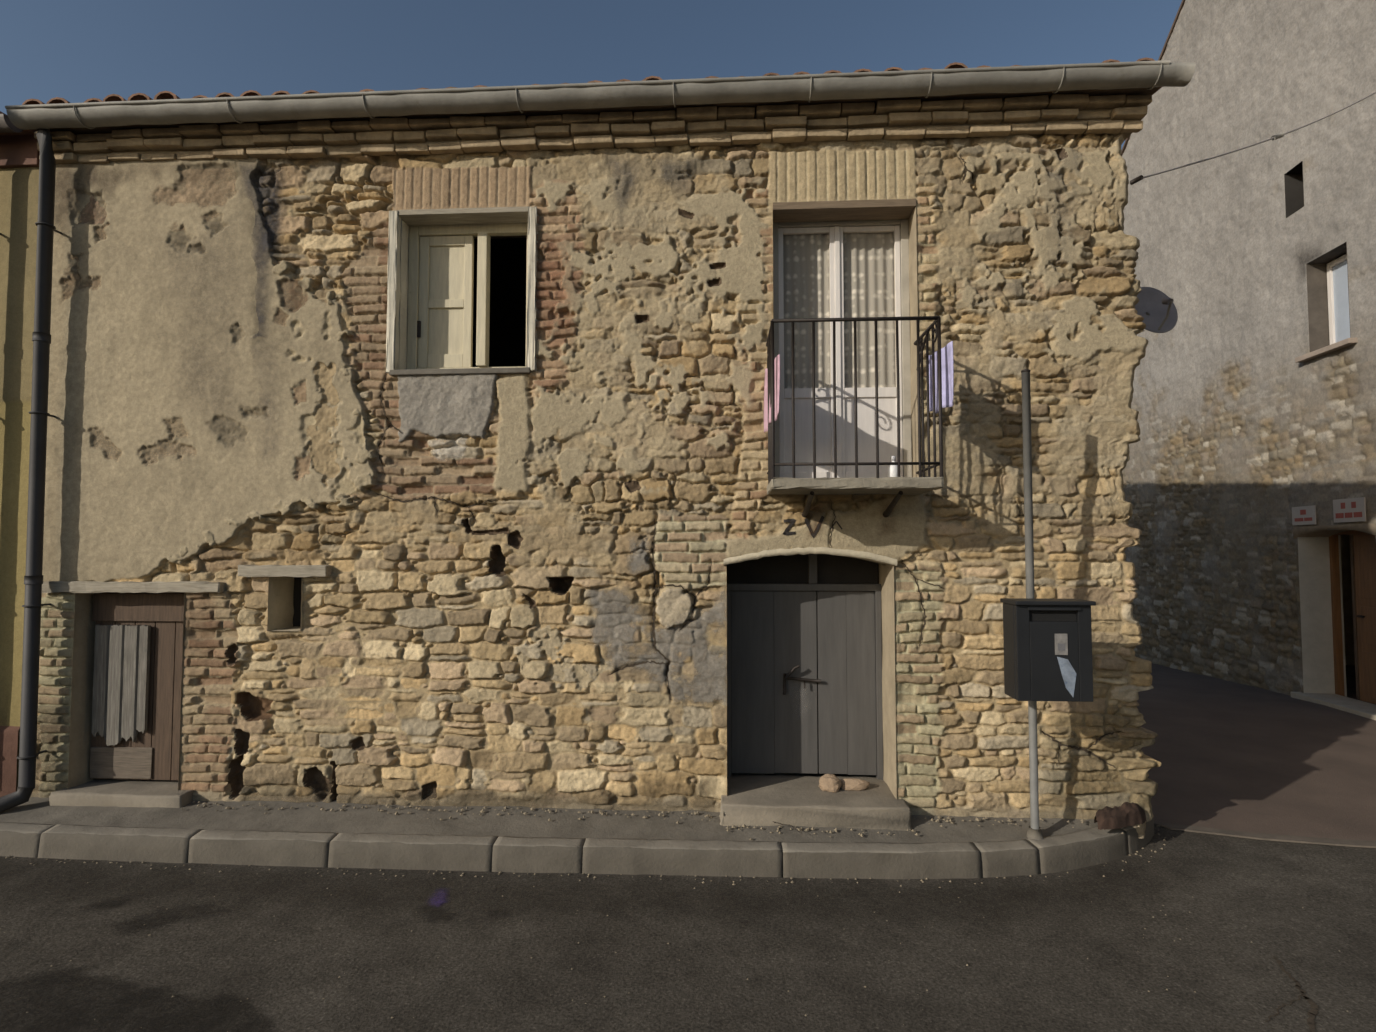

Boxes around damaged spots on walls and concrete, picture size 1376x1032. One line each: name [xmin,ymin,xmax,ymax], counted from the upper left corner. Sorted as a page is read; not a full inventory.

spalling [273,260,346,325]
flaking render [225,362,377,526]
spalling [462,517,509,535]
spalling [225,644,238,666]
spalling [226,729,250,800]
spalling [330,761,338,802]
crack [1265,956,1319,1032]